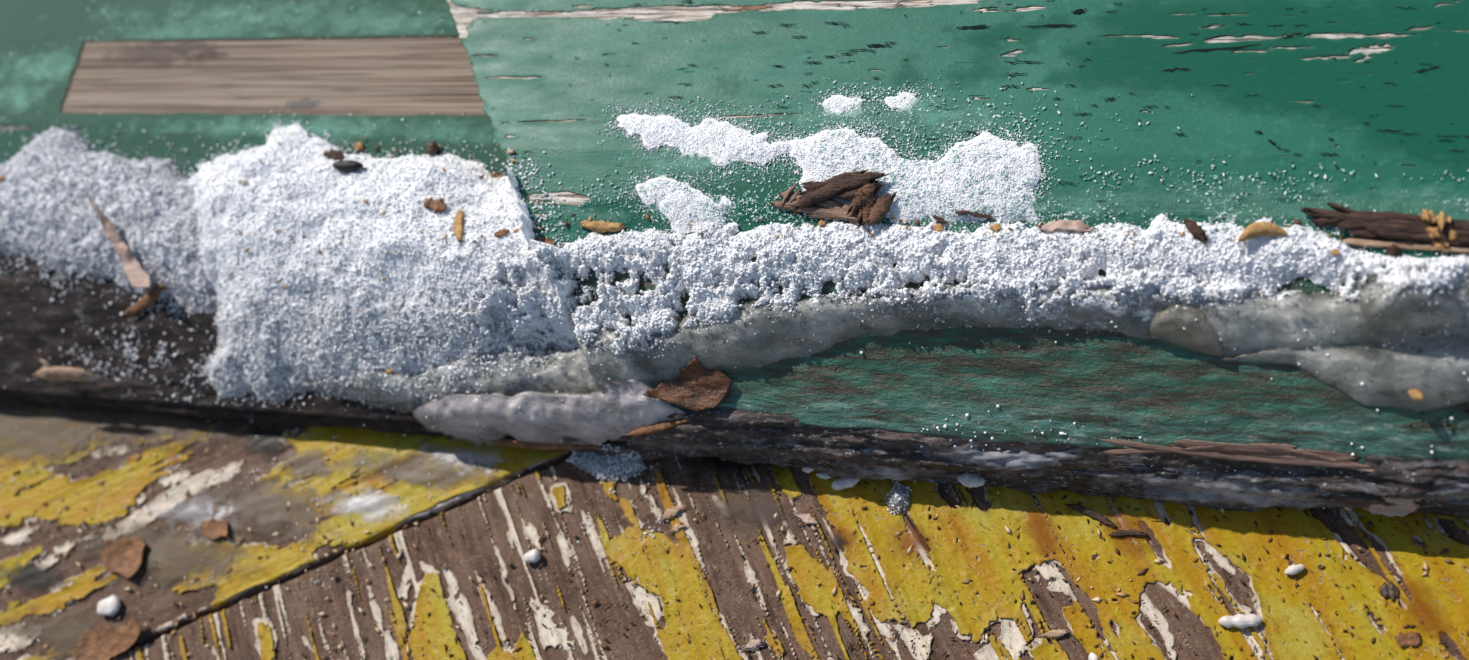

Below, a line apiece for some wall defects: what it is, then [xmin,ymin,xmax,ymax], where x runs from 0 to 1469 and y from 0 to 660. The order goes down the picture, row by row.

peeling [61,0,1045,115]
peeling [1111,13,1432,62]
peeling [525,191,590,217]
damp [598,203,669,223]
damp [703,178,828,224]
peeling [0,406,1469,660]